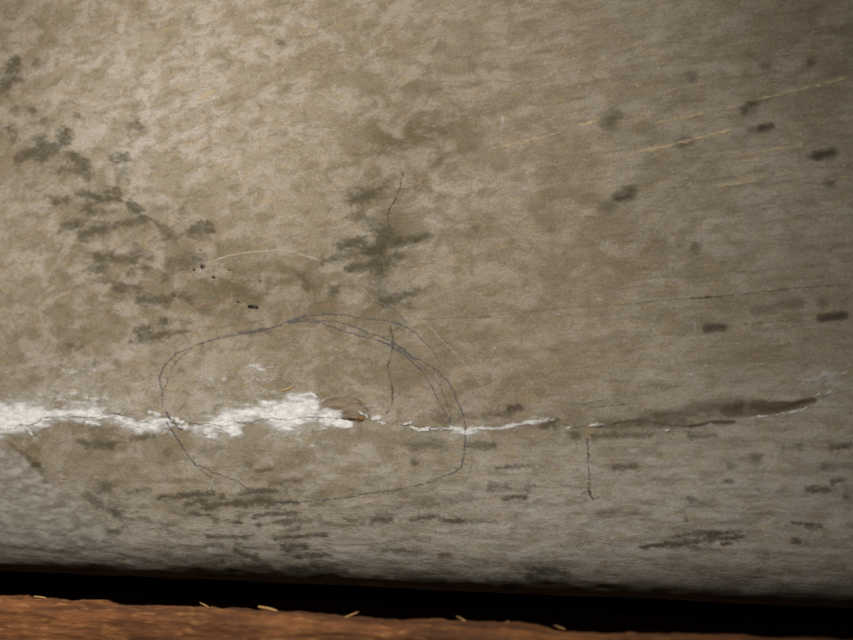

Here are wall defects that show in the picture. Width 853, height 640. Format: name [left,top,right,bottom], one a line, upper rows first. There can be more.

leakage [19,128,68,162]
leakage [76,187,146,223]
leakage [332,230,417,272]
leakage [0,390,353,440]
leakage [403,418,555,443]
leakage [174,488,298,521]
leakage [639,530,743,549]